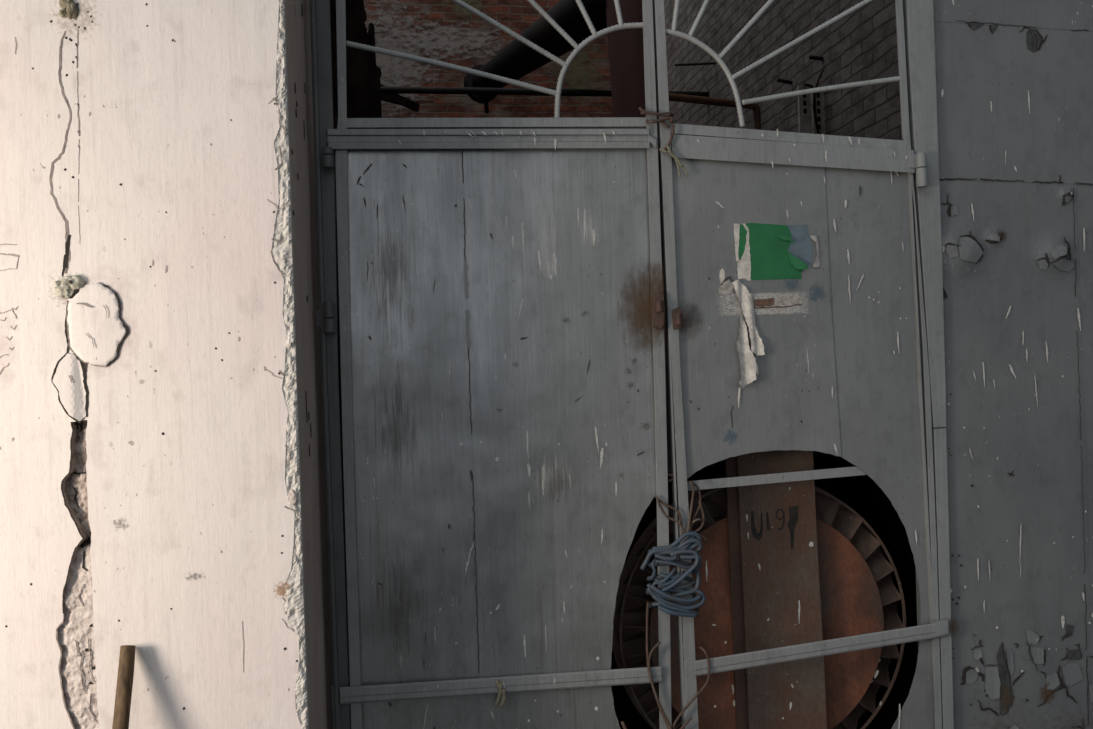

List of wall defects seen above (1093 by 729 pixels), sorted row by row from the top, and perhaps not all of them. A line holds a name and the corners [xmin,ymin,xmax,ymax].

peeling [966,22,998,34]
peeling [1019,26,1048,52]
crack [49,29,80,354]
peeling [961,624,1093,729]